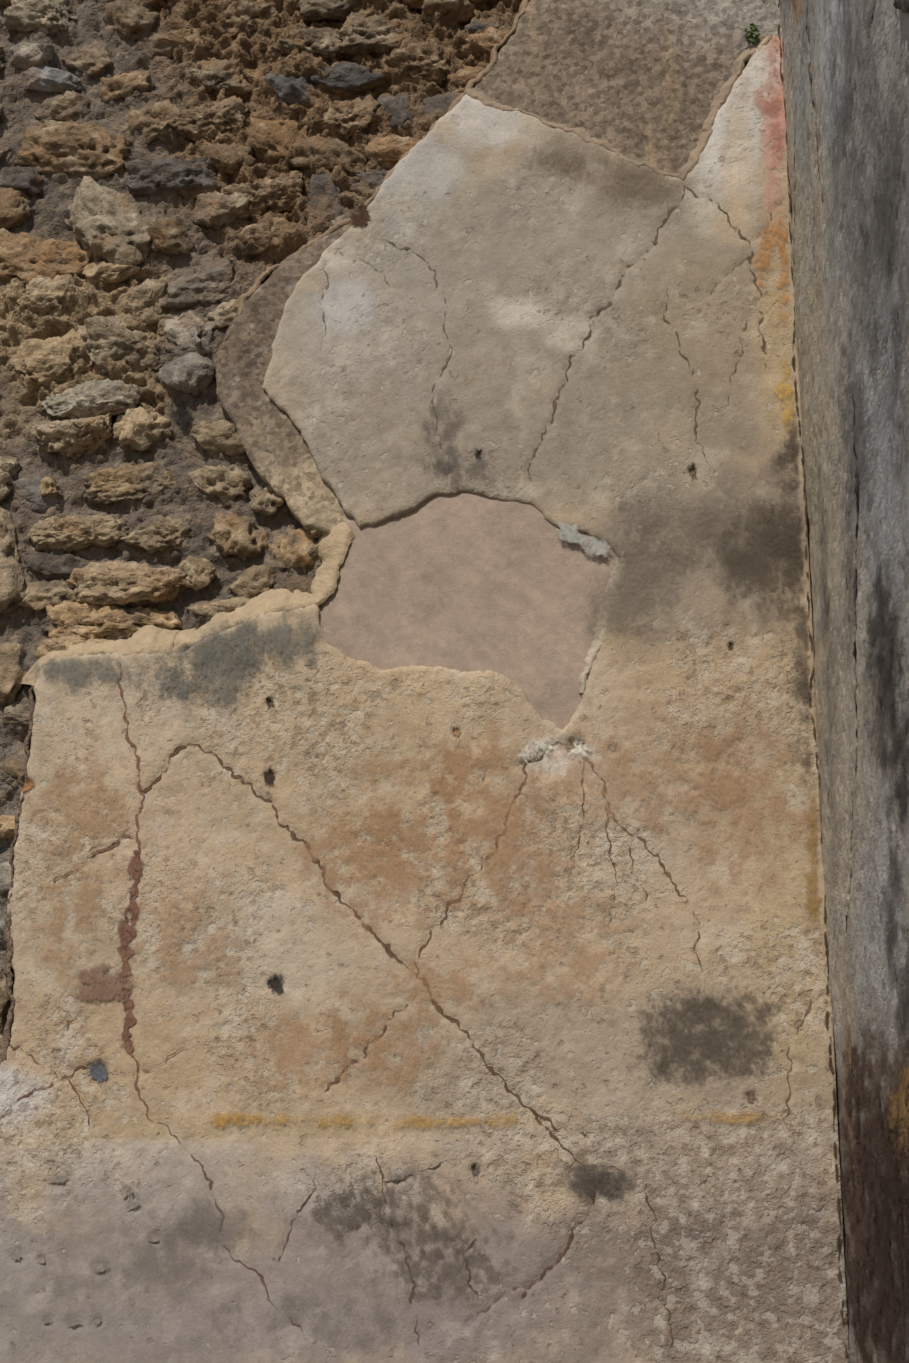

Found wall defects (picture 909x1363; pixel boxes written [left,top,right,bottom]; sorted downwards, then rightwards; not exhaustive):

flaking render [474,0,783,174]
peeling [214,221,362,534]
crack [320,239,452,470]
flaking render [518,736,591,762]
flaking render [557,522,610,557]
crack [527,0,859,1356]
water stain [592,503,802,632]
water stain [795,605,810,711]
water stain [866,562,909,833]
crack [0,1045,89,1125]
crack [52,662,703,1343]
water stain [884,851,909,1045]